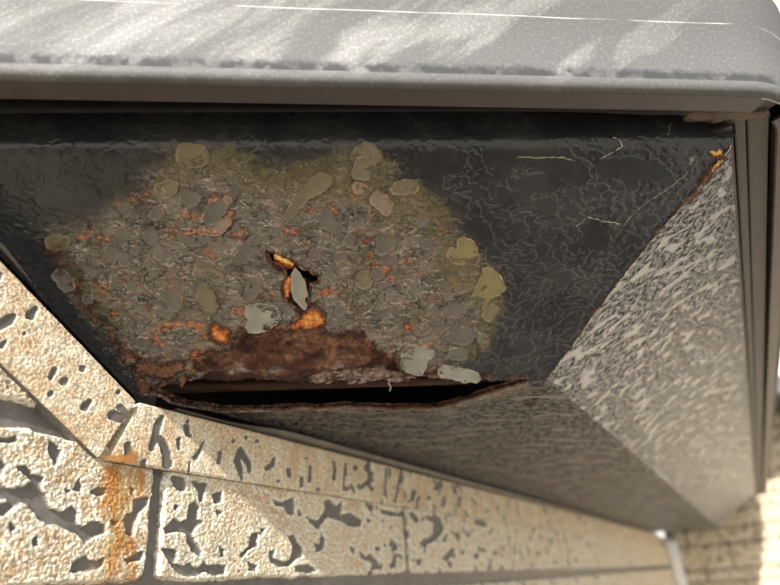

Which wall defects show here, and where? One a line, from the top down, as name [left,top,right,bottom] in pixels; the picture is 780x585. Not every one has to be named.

peeling [44,141,507,399]
corrosion [273,254,297,298]
corrosion [206,322,233,347]
corrosion [288,305,328,331]
corrosion [99,448,145,583]